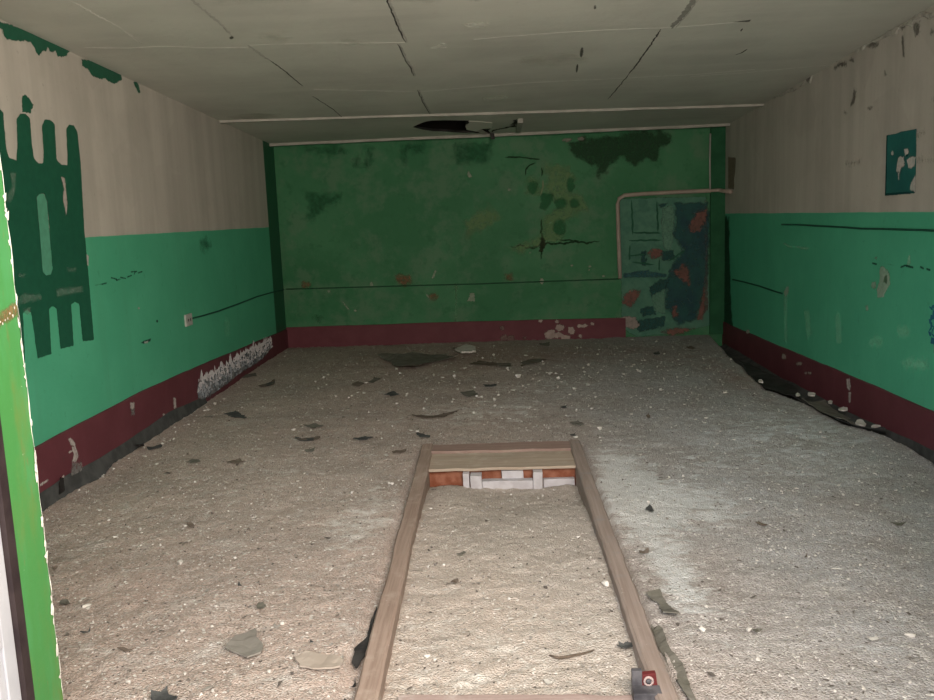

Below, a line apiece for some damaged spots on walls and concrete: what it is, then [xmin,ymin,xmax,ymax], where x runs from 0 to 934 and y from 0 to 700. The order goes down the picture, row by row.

peeling [0,22,69,57]
peeling [82,59,122,84]
crack [386,0,431,114]
crack [609,0,698,98]
crack [505,156,544,196]
crack [511,219,599,259]
flaking render [871,257,890,298]
rust [0,304,18,325]
flaking render [538,319,594,339]
leakage [197,336,273,400]